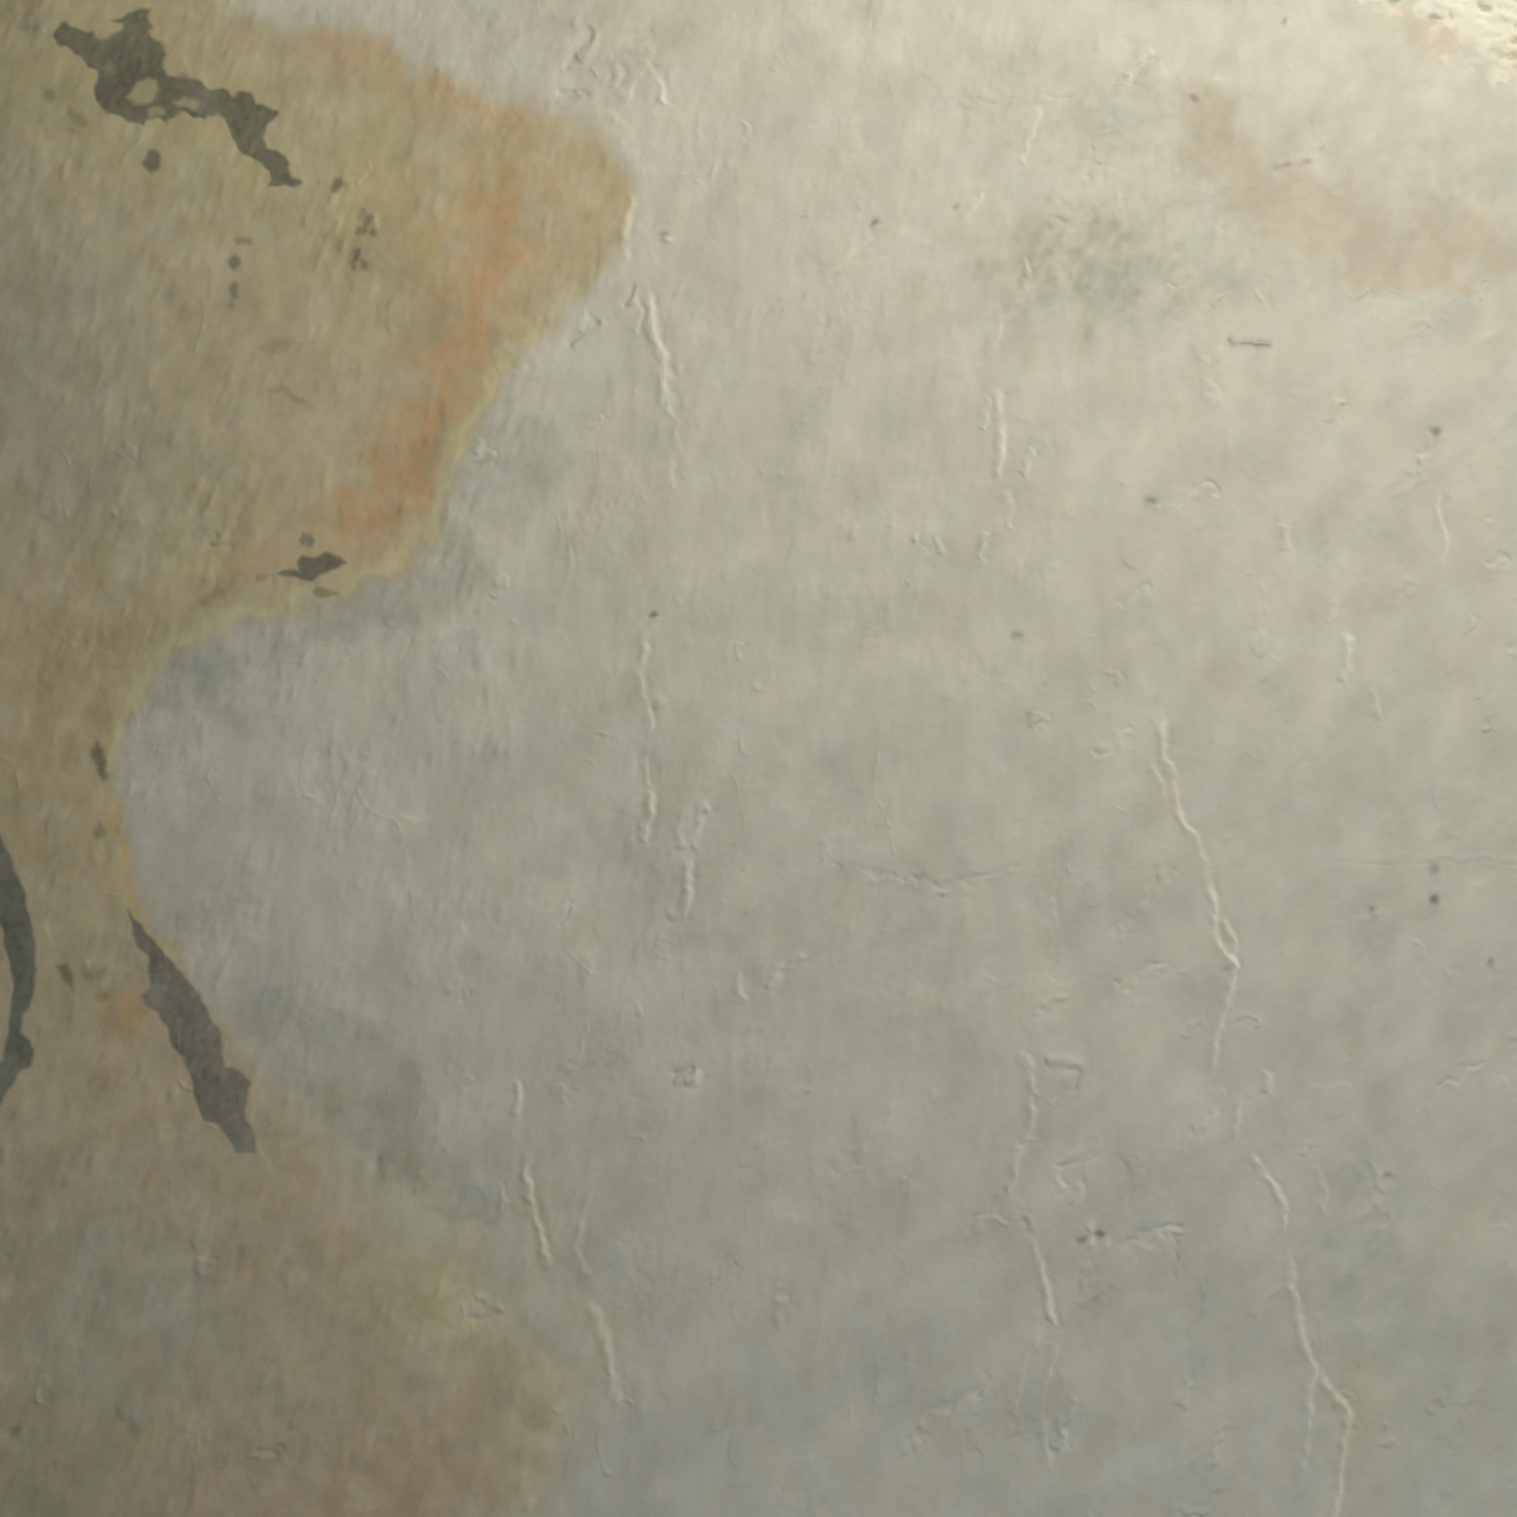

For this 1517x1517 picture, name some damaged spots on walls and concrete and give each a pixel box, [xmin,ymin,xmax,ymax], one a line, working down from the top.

damp [1156,63,1517,319]
damp [0,0,645,1517]
crack [1153,716,1354,1517]